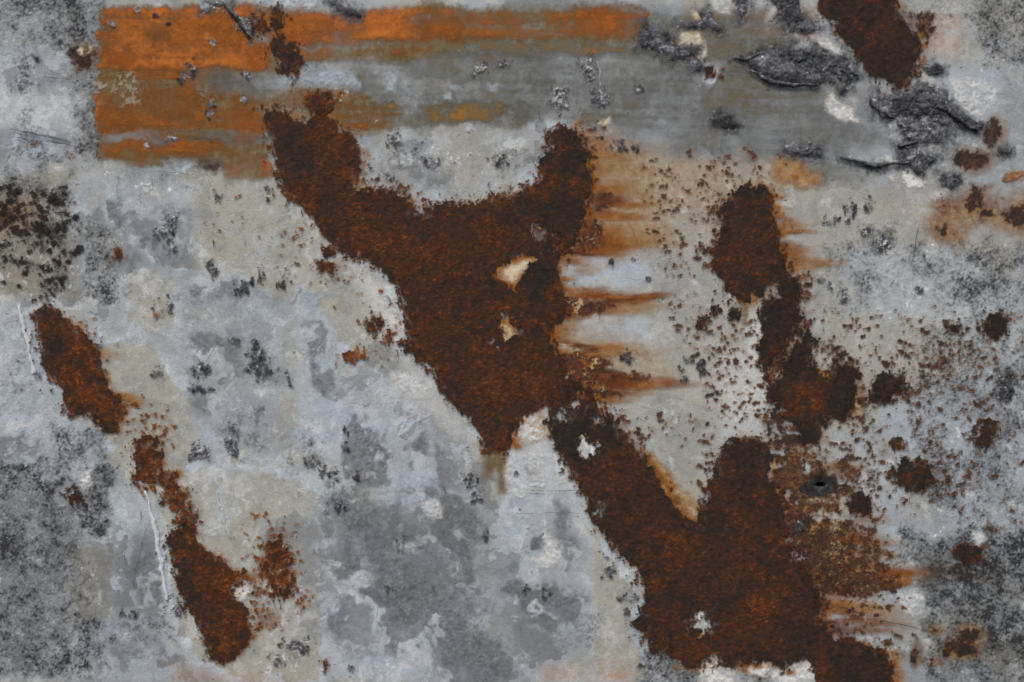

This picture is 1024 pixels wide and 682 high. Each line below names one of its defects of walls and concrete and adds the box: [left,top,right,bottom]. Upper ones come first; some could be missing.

rust [817,0,936,92]
rust [769,153,819,188]
rust [641,193,684,219]
rust [930,184,1024,239]
rust [664,229,696,277]
rust [832,311,883,338]
rust [336,345,379,365]
rust [0,181,313,665]
rust [885,436,908,454]
rust [919,410,971,467]